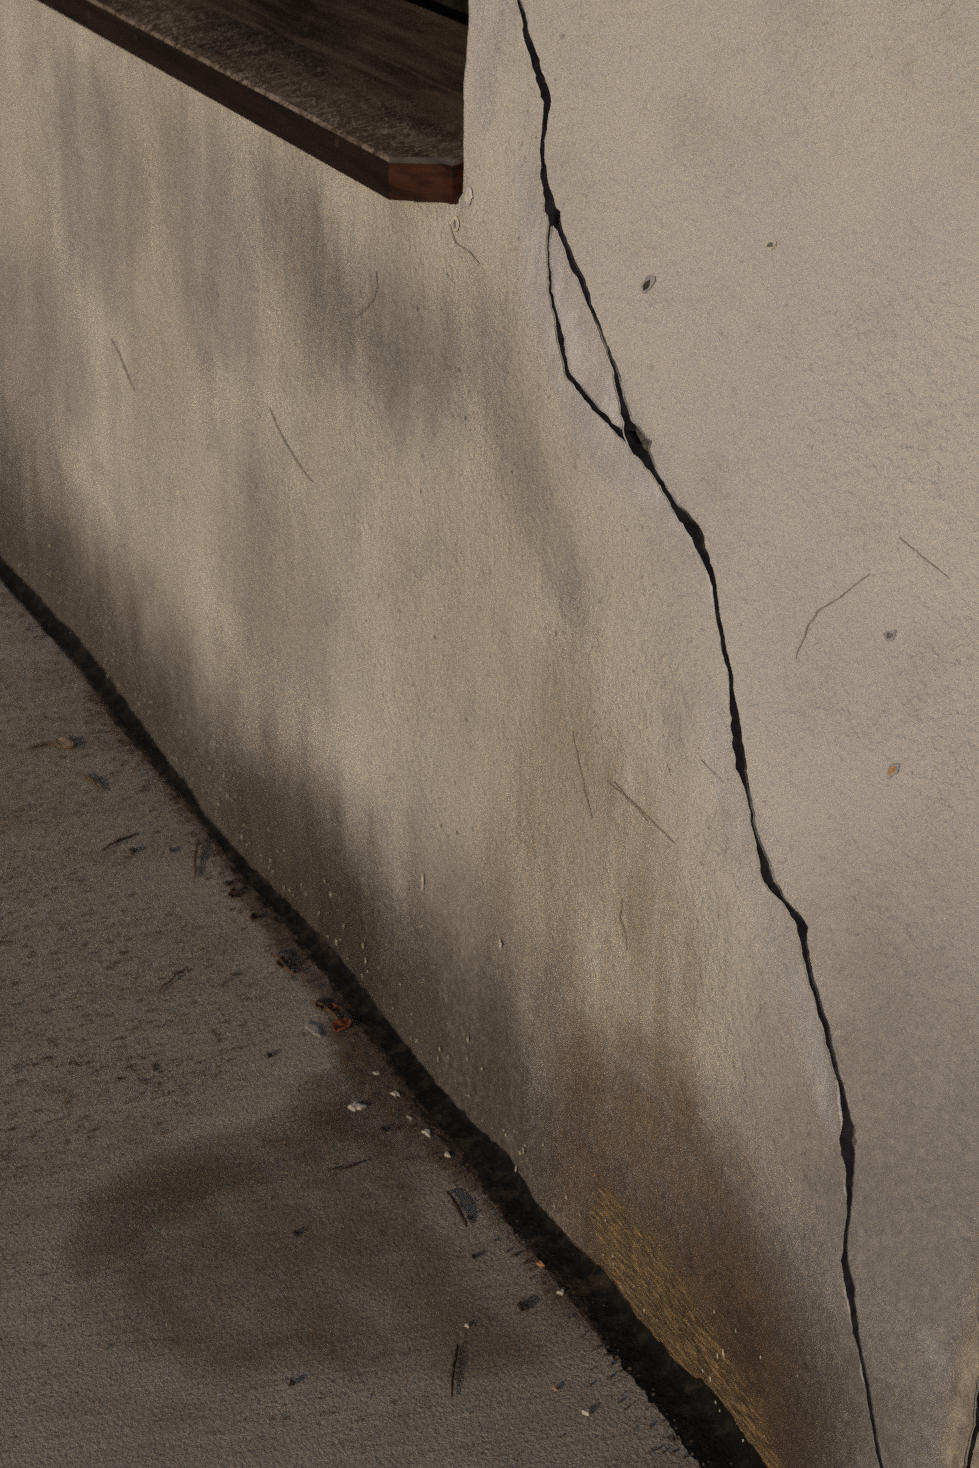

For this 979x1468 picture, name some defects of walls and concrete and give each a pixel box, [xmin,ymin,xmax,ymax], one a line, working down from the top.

crack [899,537,950,579]
leakage [0,458,367,986]
crack [516,0,885,1468]
leakage [625,1190,971,1468]
crack [964,1390,979,1468]